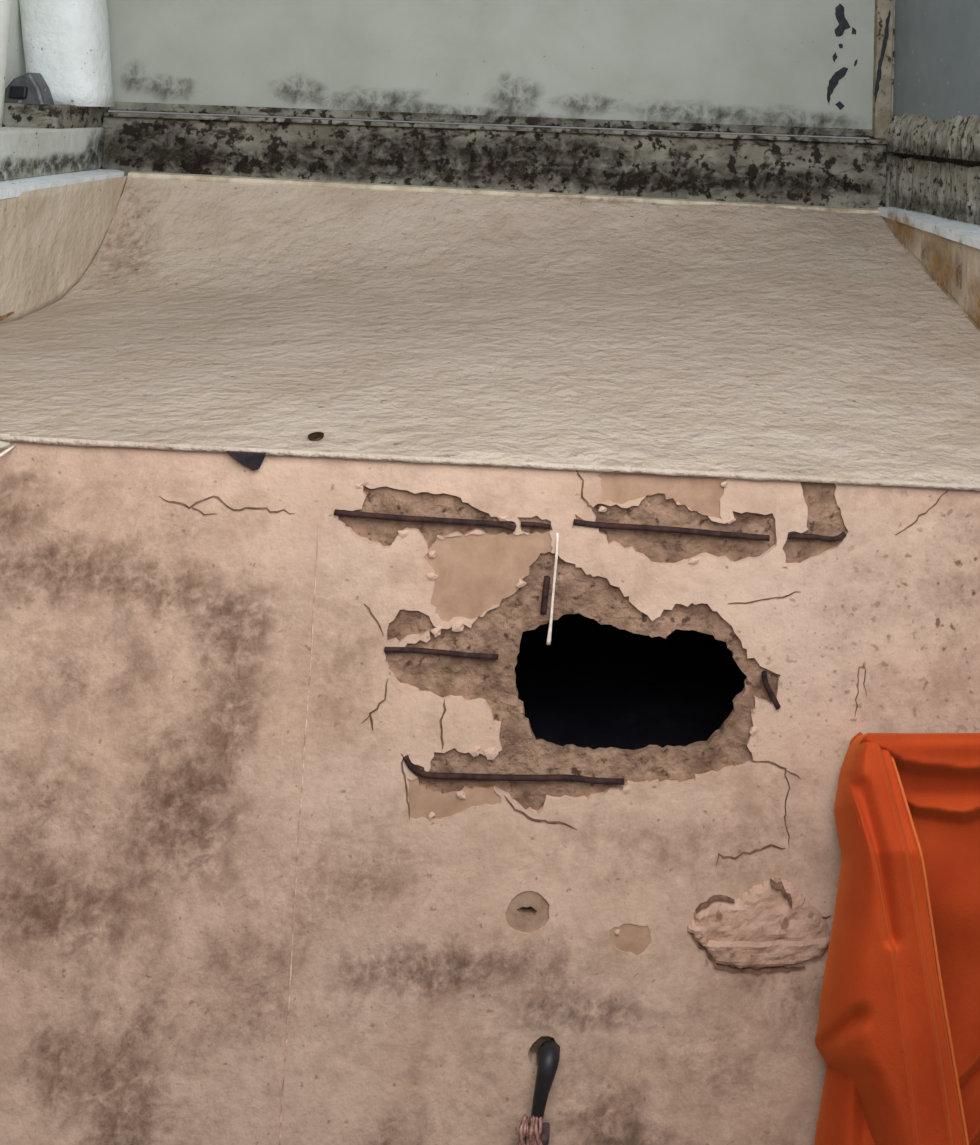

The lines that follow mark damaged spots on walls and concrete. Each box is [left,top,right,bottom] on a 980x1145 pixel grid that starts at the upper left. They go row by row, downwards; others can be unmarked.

leakage [0,128,869,194]
crack [159,495,294,515]
spalling [573,472,848,569]
spalling [334,483,781,821]
crack [716,759,800,866]